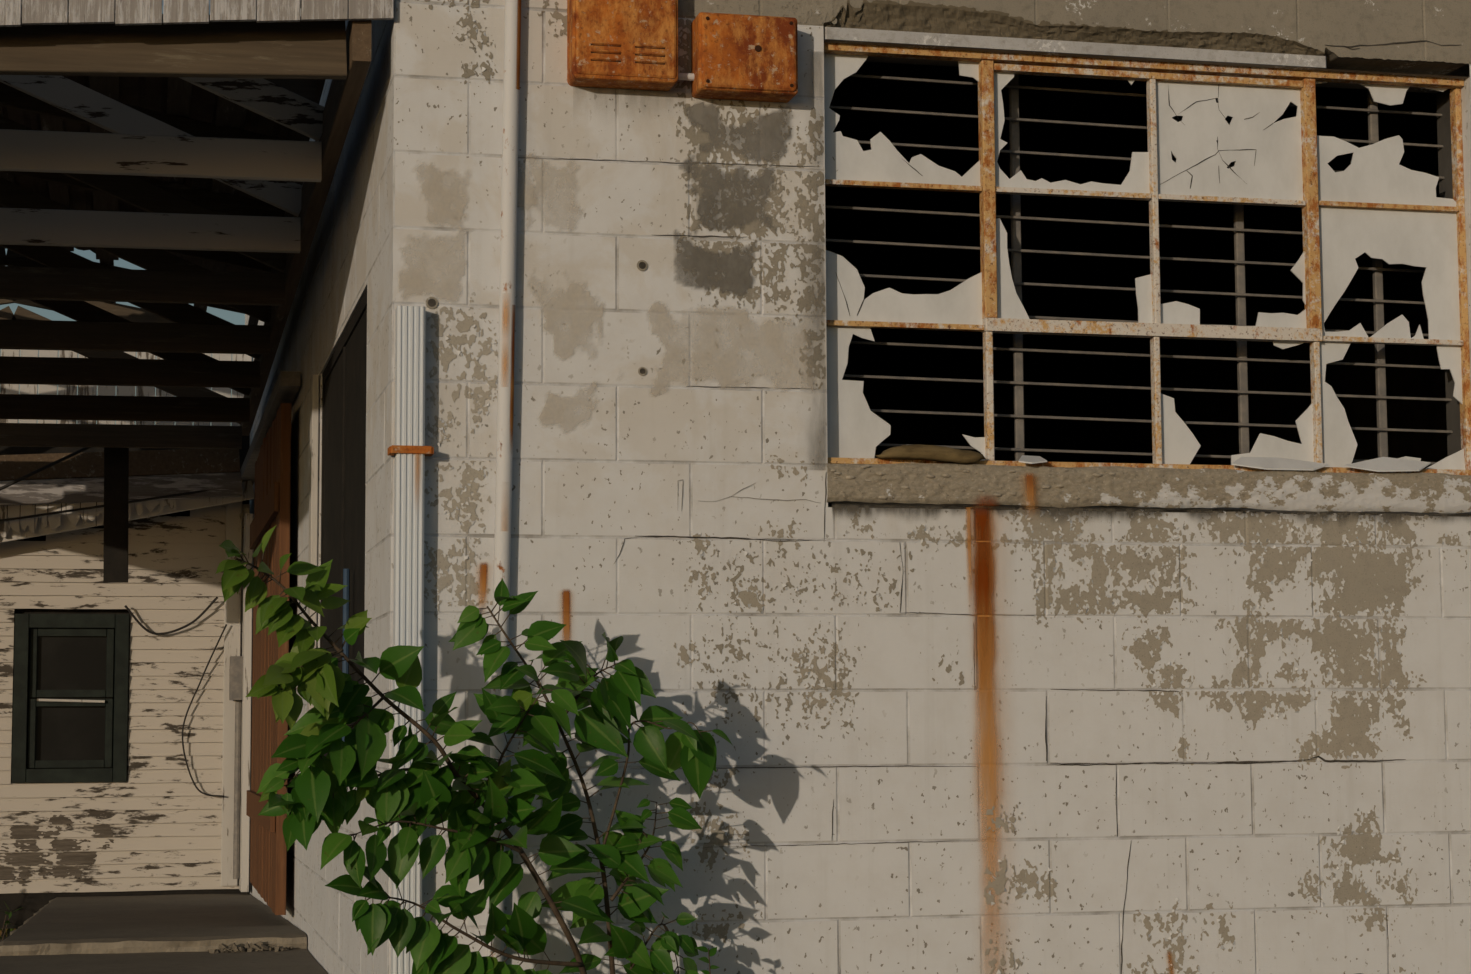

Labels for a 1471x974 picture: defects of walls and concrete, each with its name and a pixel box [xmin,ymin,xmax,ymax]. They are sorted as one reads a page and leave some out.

peeling [404,0,498,87]
peeling [523,0,567,37]
peeling [424,297,498,622]
peeling [767,452,815,487]
corrosion [967,498,996,855]
peeling [674,508,1467,770]
peeling [1127,897,1242,974]
peeling [1298,805,1419,939]